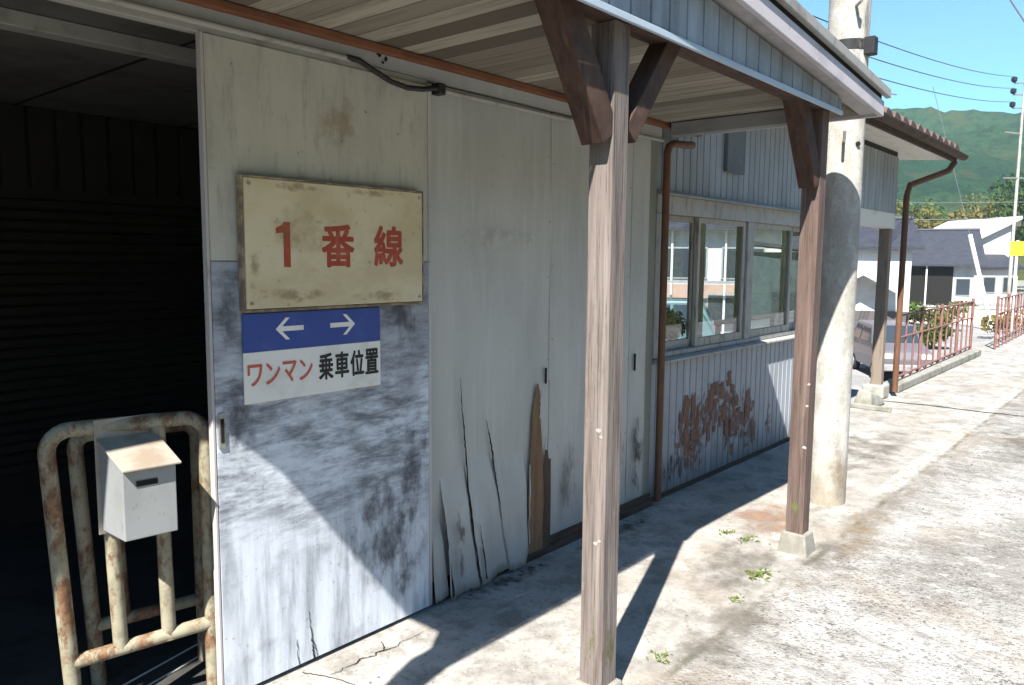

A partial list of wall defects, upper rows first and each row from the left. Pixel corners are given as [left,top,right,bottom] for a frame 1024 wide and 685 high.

crack [444,378,509,597]
peeling [528,384,551,554]